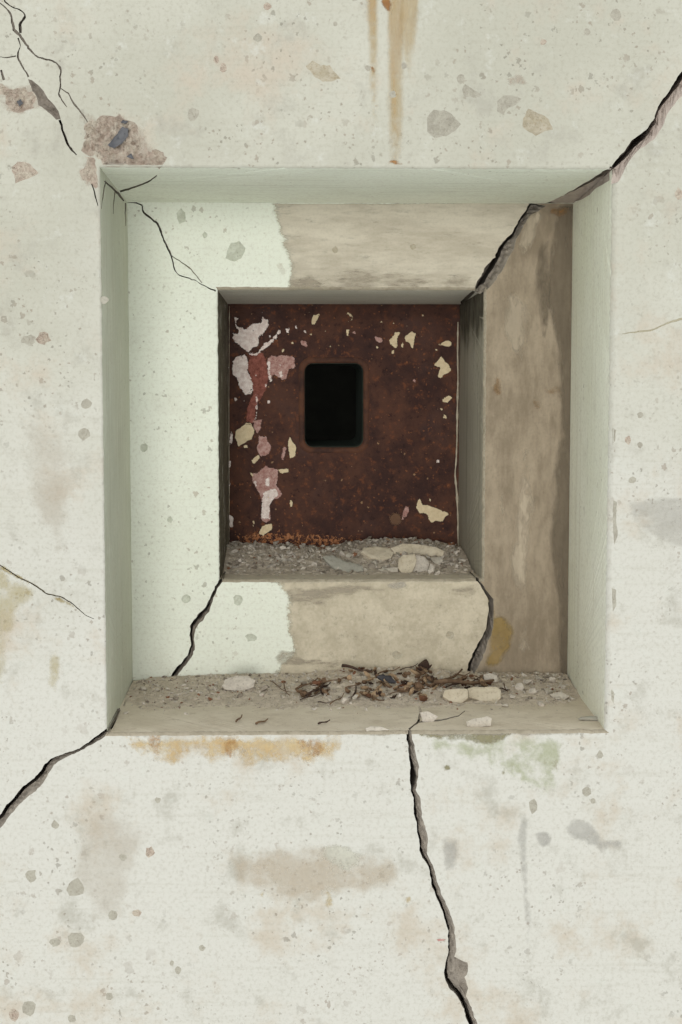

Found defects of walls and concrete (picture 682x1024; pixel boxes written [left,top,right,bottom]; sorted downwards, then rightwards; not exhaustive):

rust [369,0,396,34]
spalling [0,79,61,120]
crack [0,0,88,155]
spalling [80,114,167,188]
crack [91,175,216,292]
crack [462,72,682,303]
peeling [228,314,326,536]
rust [235,529,352,546]
crack [171,571,226,676]
crack [467,571,494,673]
crack [0,702,125,828]
crack [406,711,477,1024]